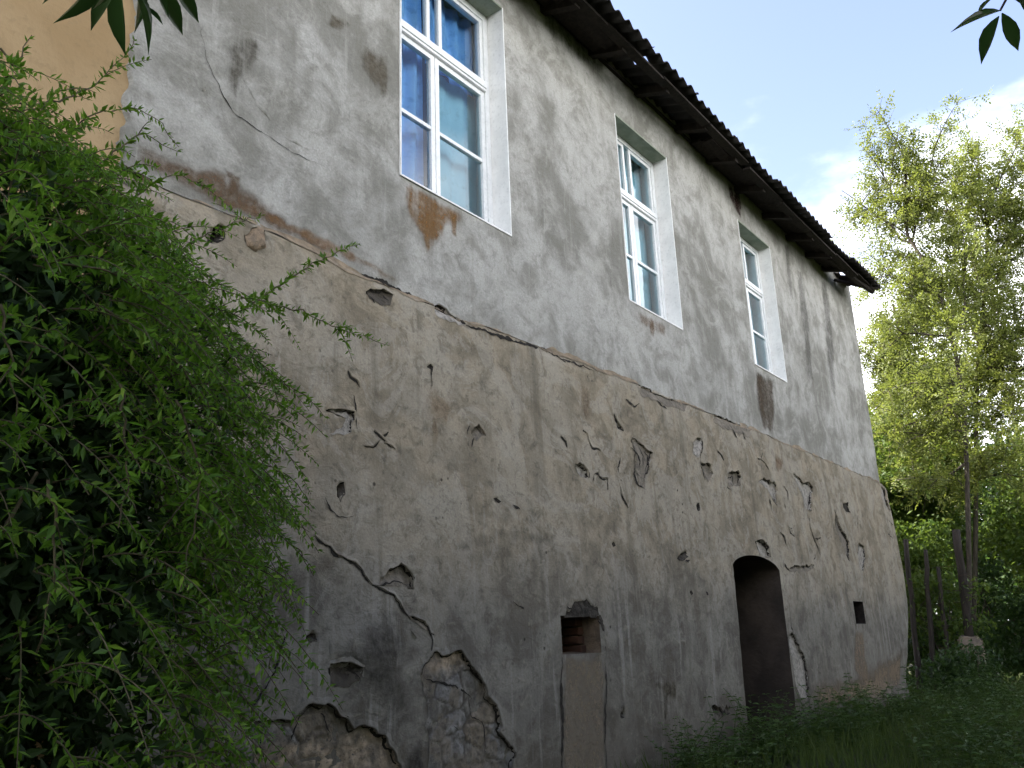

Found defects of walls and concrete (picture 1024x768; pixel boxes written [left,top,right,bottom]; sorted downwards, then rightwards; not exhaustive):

crack [201,35,316,163]
damp [146,159,291,230]
corrosion [409,190,457,248]
flaking render [365,284,393,306]
crack [364,428,396,449]
crack [561,429,629,508]
flaking render [614,413,654,489]
damp [757,374,774,430]
crack [314,533,409,618]
flaking render [377,557,417,589]
flaking render [253,656,405,768]
flaking render [408,613,518,768]